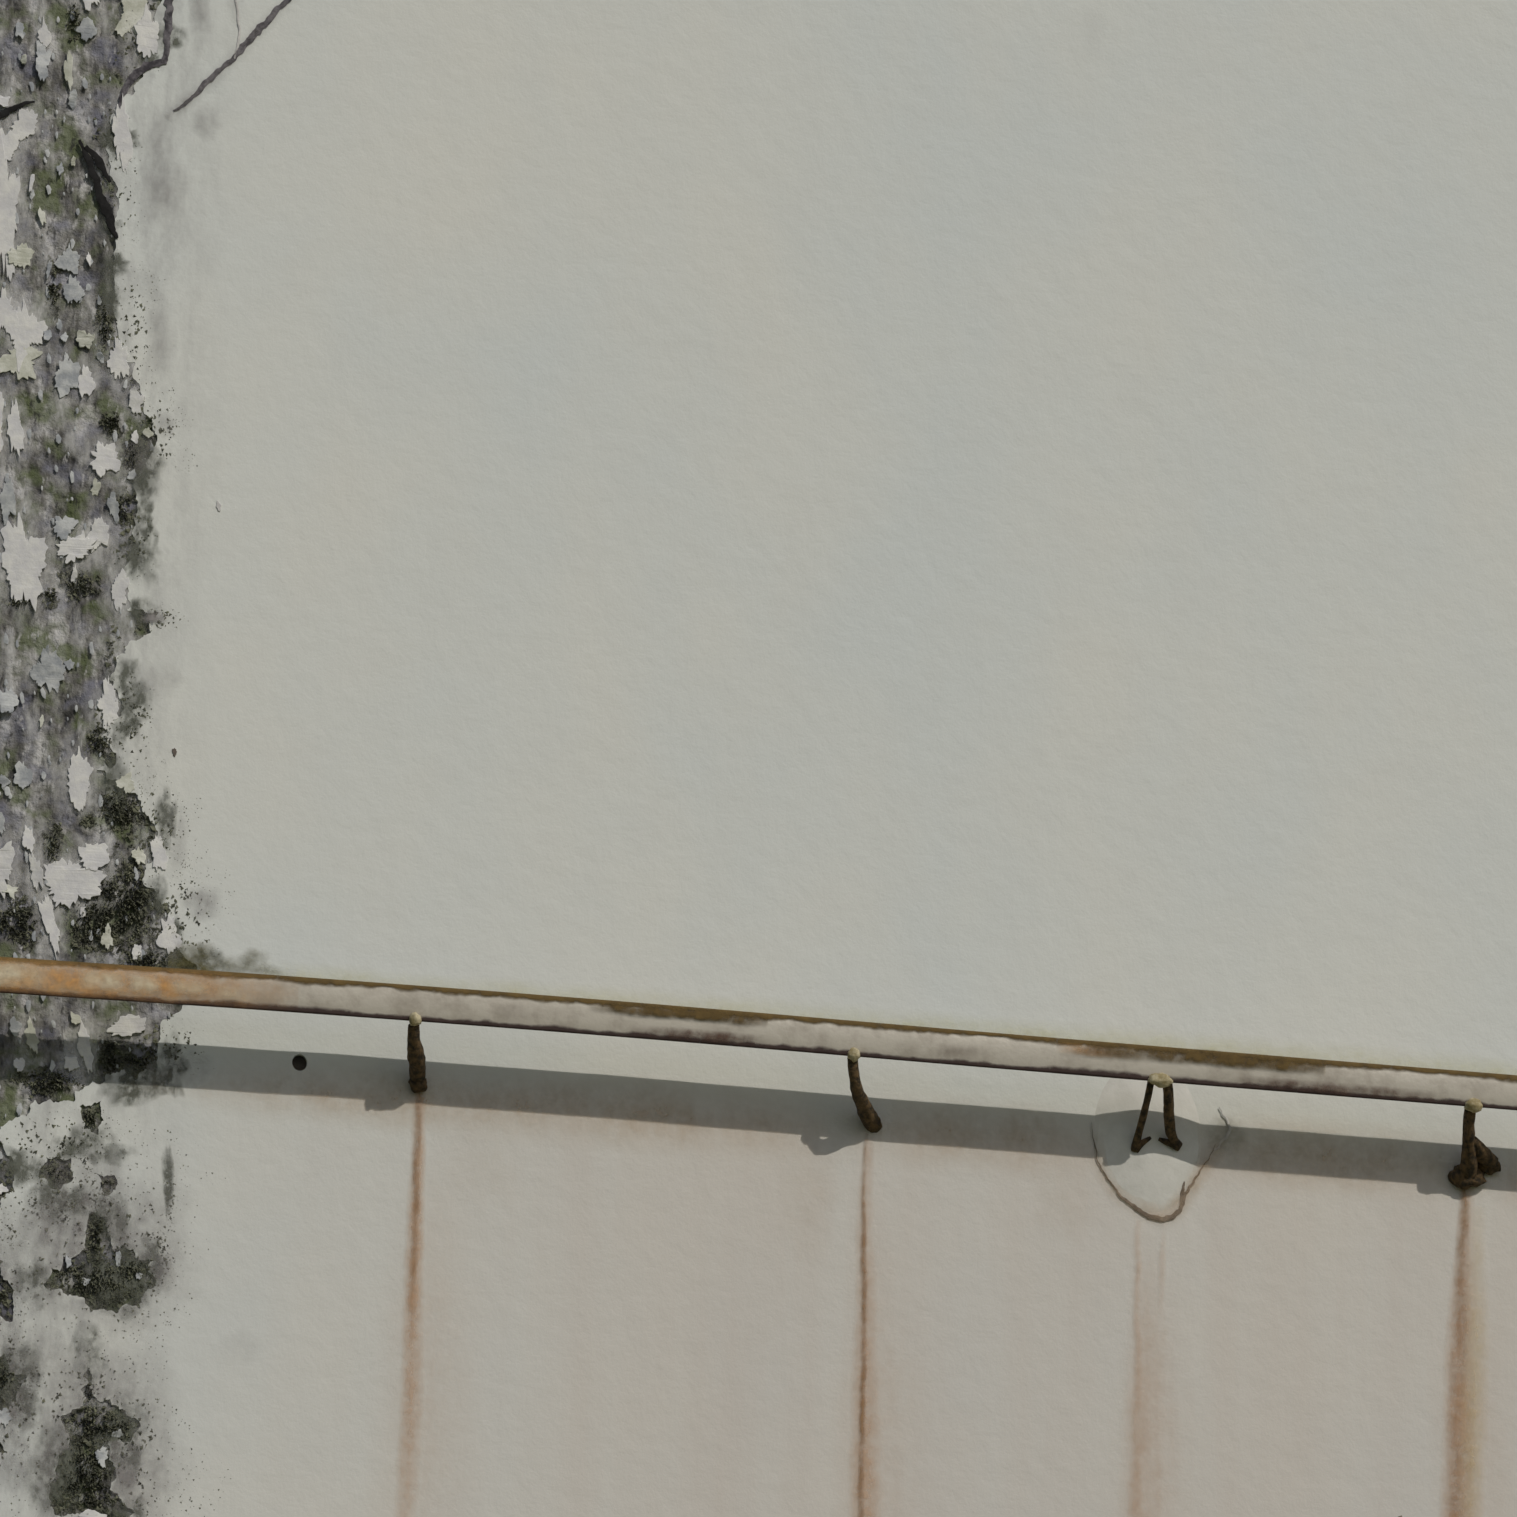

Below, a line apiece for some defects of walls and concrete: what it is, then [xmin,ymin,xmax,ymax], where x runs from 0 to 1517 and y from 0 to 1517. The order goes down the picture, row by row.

crack [118,0,174,108]
crack [173,0,291,111]
peeling [0,0,235,1517]
corrosion [0,957,1517,1110]
corrosion [408,1137,422,1338]
corrosion [860,1365,870,1515]